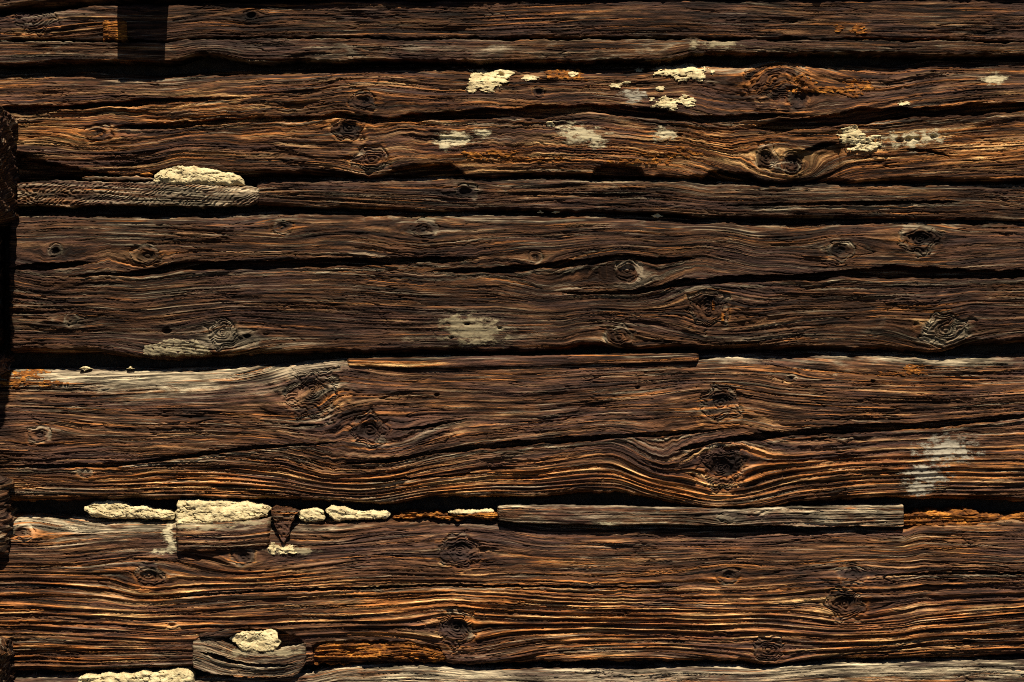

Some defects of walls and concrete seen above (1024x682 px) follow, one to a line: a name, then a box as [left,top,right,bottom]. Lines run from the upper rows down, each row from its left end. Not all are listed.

efflorescence [623,88,647,103]
leakage [881,128,941,148]